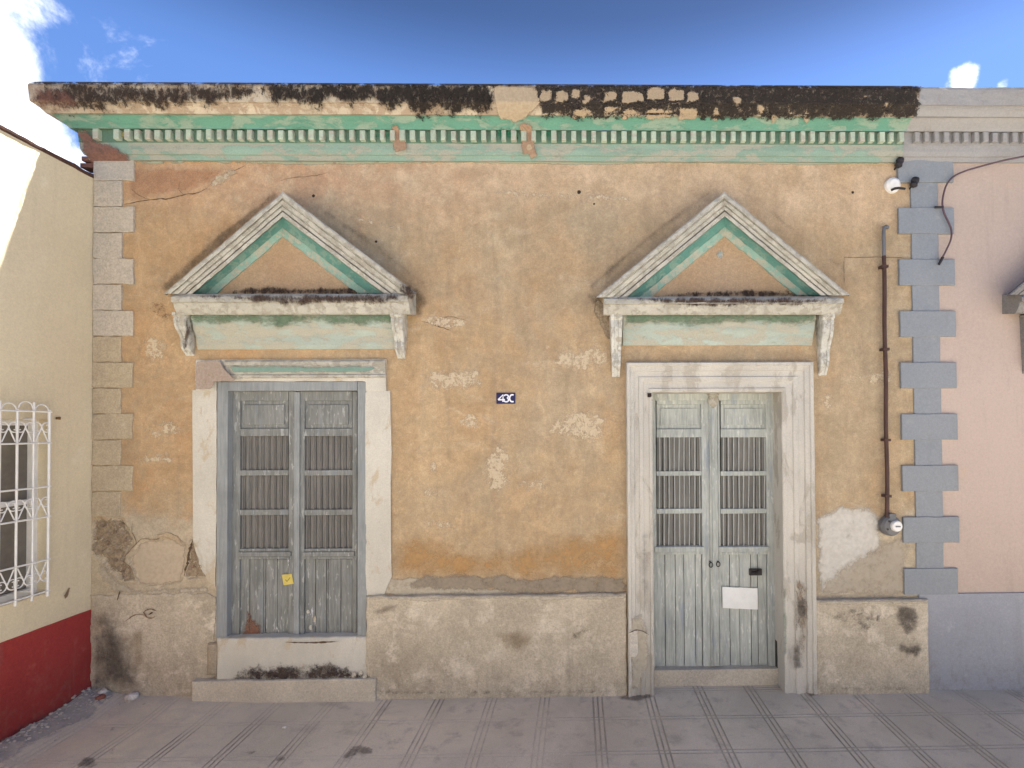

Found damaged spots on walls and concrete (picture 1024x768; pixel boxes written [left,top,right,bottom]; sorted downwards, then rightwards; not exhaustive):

flaking render [78,130,130,173]
flaking render [392,125,407,152]
peeling [494,86,540,159]
crack [124,165,245,205]
peeling [426,369,481,390]
peeling [550,411,613,441]
peeling [482,444,546,493]
flaking render [92,520,205,584]
peeling [823,540,908,595]
corrosion [243,613,260,634]
leakage [899,608,916,631]